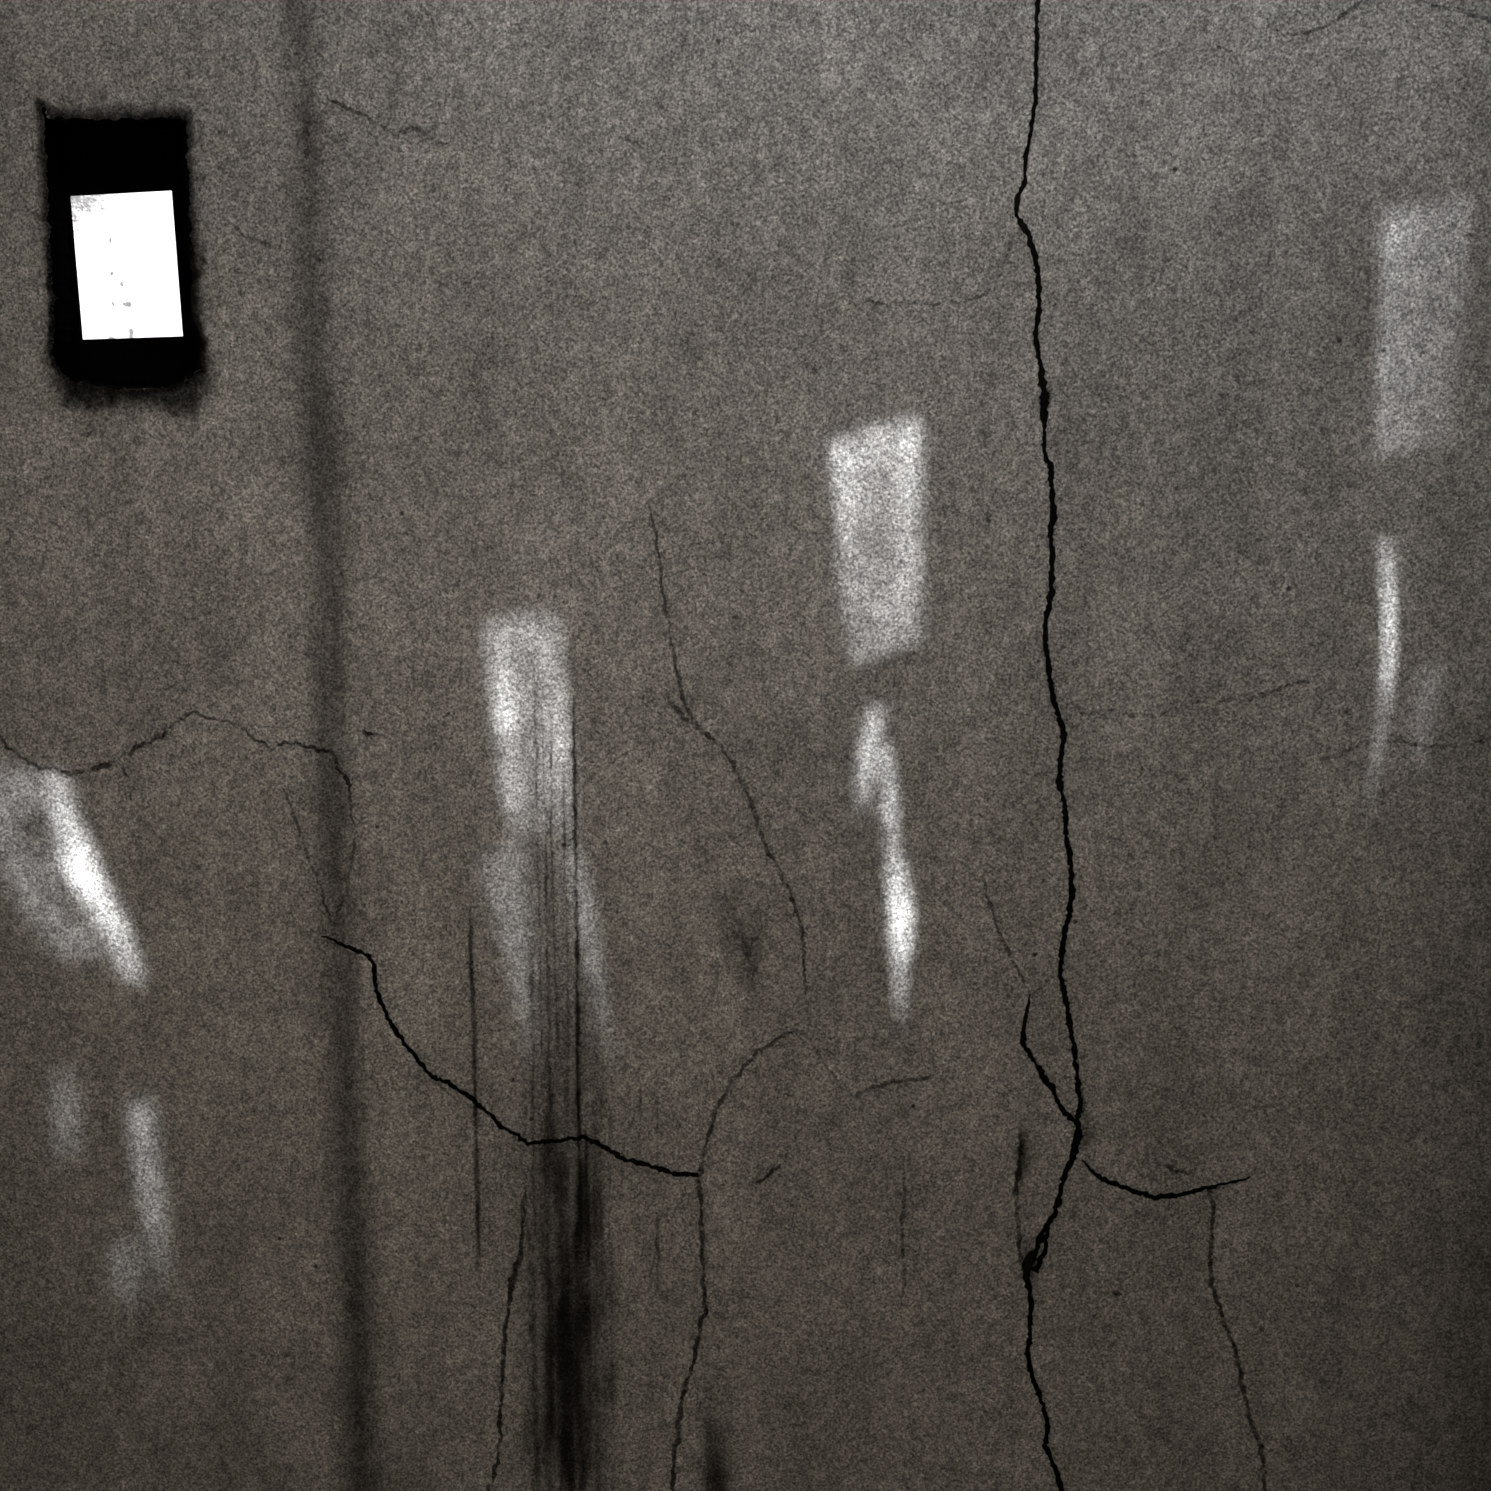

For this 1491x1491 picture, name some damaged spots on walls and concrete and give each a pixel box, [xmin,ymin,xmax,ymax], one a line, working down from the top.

crack [1275,3,1358,36]
crack [1421,0,1491,23]
crack [1109,680,1309,717]
crack [362,729,377,737]
crack [648,501,806,986]
crack [870,0,1268,1491]
crack [0,710,356,846]
crack [824,1063,928,1097]
crack [321,900,802,1491]